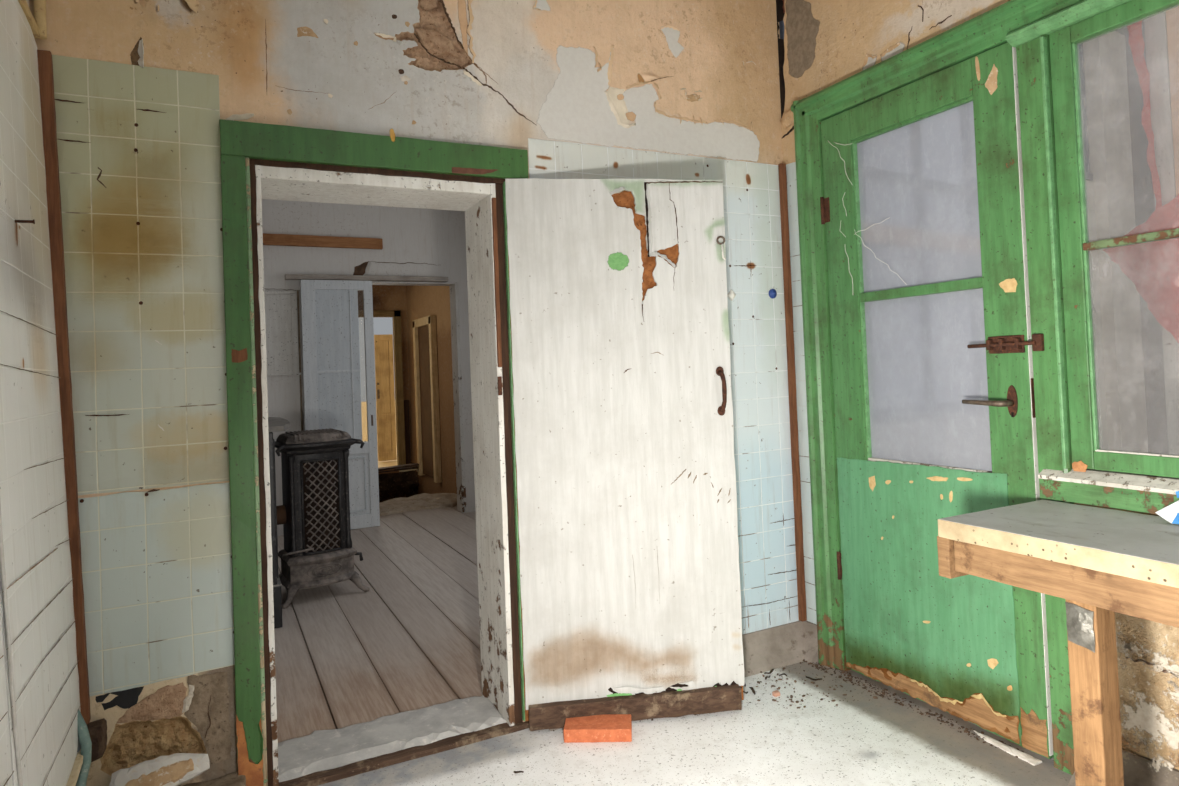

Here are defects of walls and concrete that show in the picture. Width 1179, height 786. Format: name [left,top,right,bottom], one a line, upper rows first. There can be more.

flaking render [374,0,476,82]
crack [457,41,537,126]
peeling [537,45,760,162]
flaking render [785,0,820,78]
flaking render [100,672,264,786]
peeling [846,662,1049,758]
peeling [1115,612,1179,772]